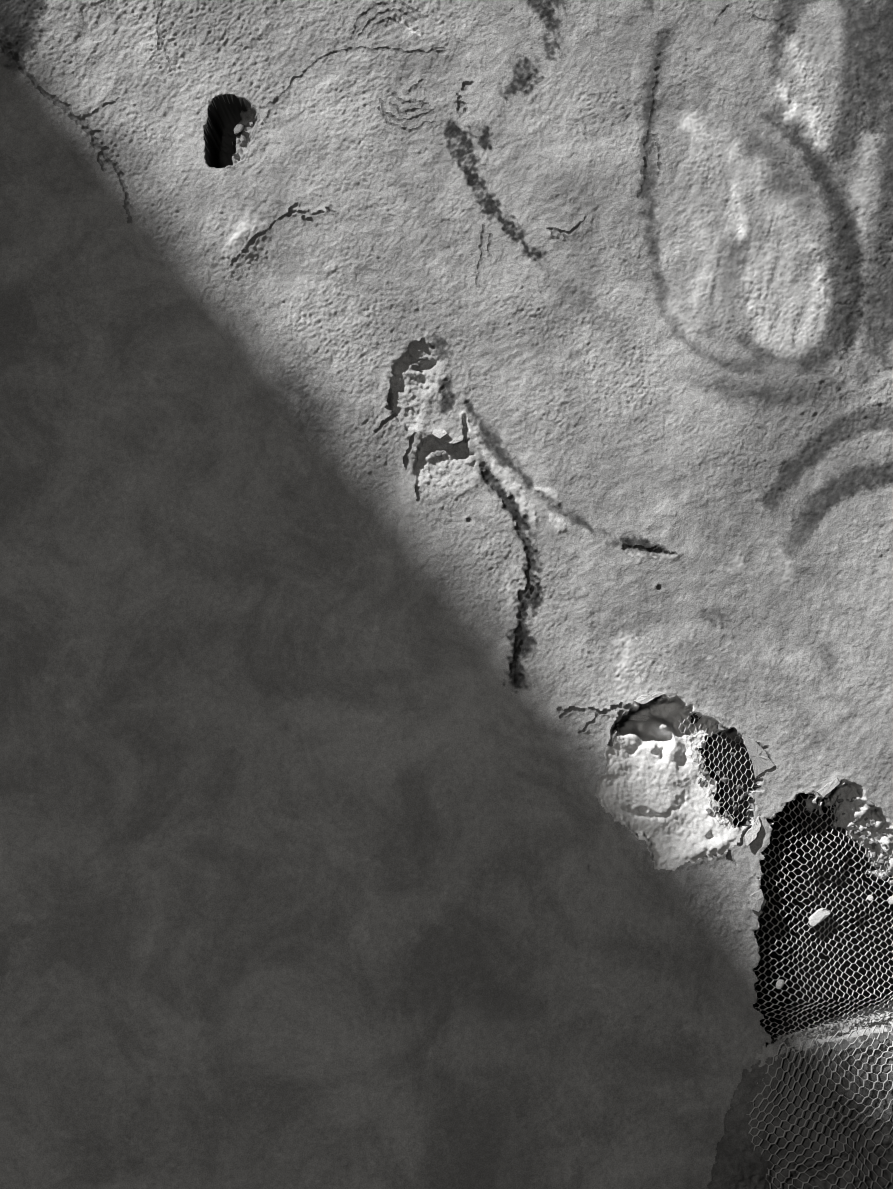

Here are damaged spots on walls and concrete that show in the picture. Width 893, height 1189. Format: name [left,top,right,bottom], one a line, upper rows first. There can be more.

spalling [203,93,260,169]
crack [263,0,475,133]
crack [227,202,337,271]
crack [373,388,421,502]
flaking render [389,336,479,498]
crack [462,416,541,682]
spalling [595,692,893,1189]